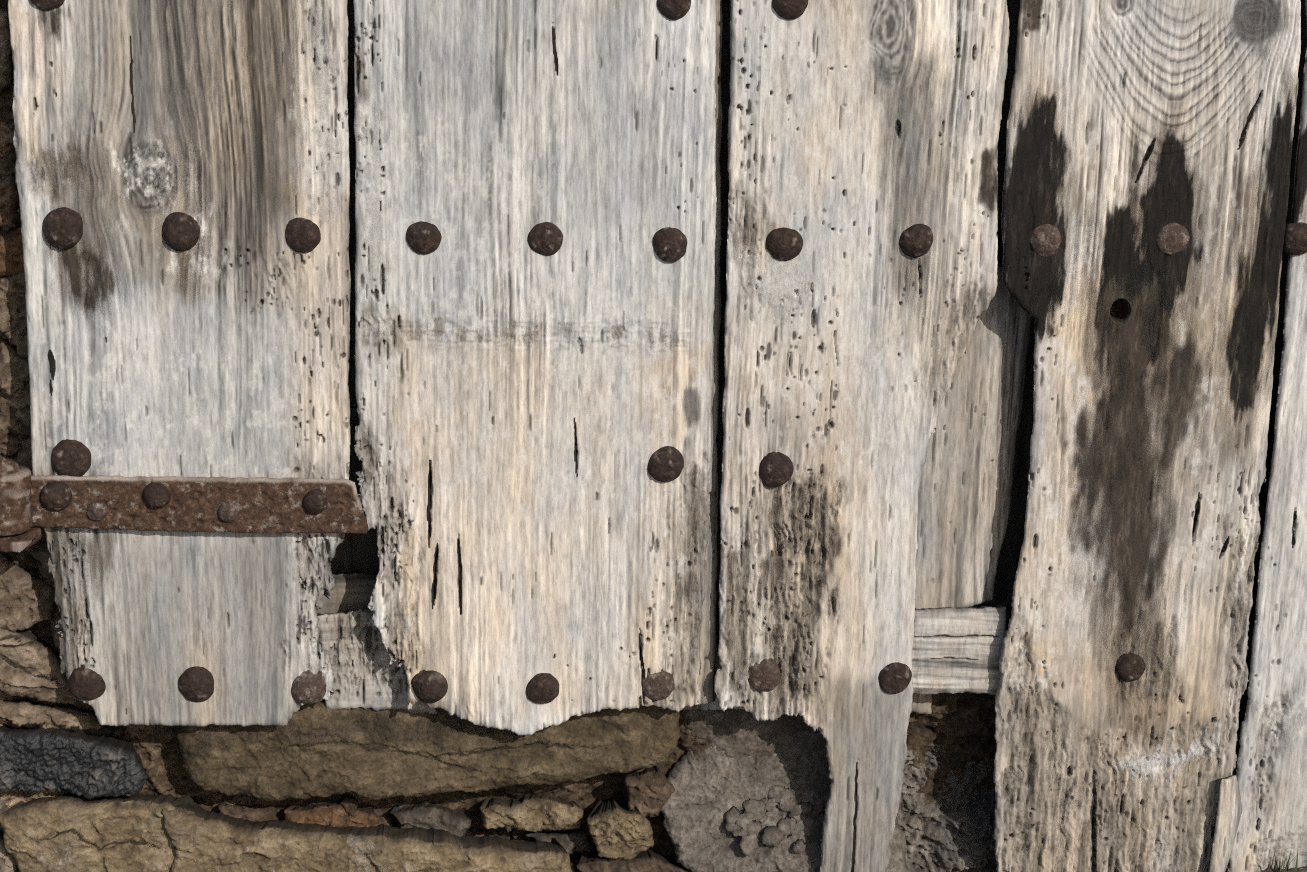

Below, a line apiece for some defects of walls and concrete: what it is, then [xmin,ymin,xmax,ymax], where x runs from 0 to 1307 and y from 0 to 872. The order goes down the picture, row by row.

crack [1238,90,1263,149]
water stain [978,150,998,210]
water stain [1291,129,1307,224]
water stain [1025,281,1054,341]
water stain [1062,181,1202,671]
crack [1290,511,1298,548]